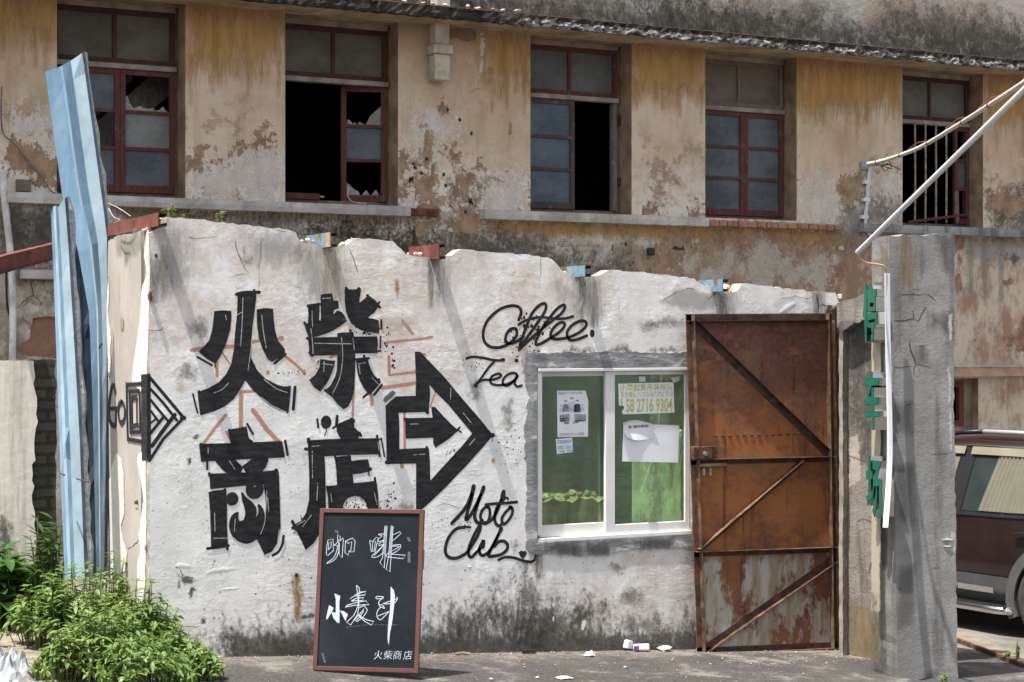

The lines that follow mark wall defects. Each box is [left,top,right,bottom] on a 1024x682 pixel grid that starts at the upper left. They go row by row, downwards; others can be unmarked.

leakage [186,4,285,79]
leakage [632,43,705,100]
leakage [797,57,902,116]
peeling [0,100,57,191]
peeling [186,119,285,215]
peeling [398,97,487,242]
leakage [122,201,901,327]
peeling [612,163,902,309]
peeling [983,187,1024,222]
crack [895,289,936,371]
leakage [211,620,314,657]
leakage [420,542,697,654]